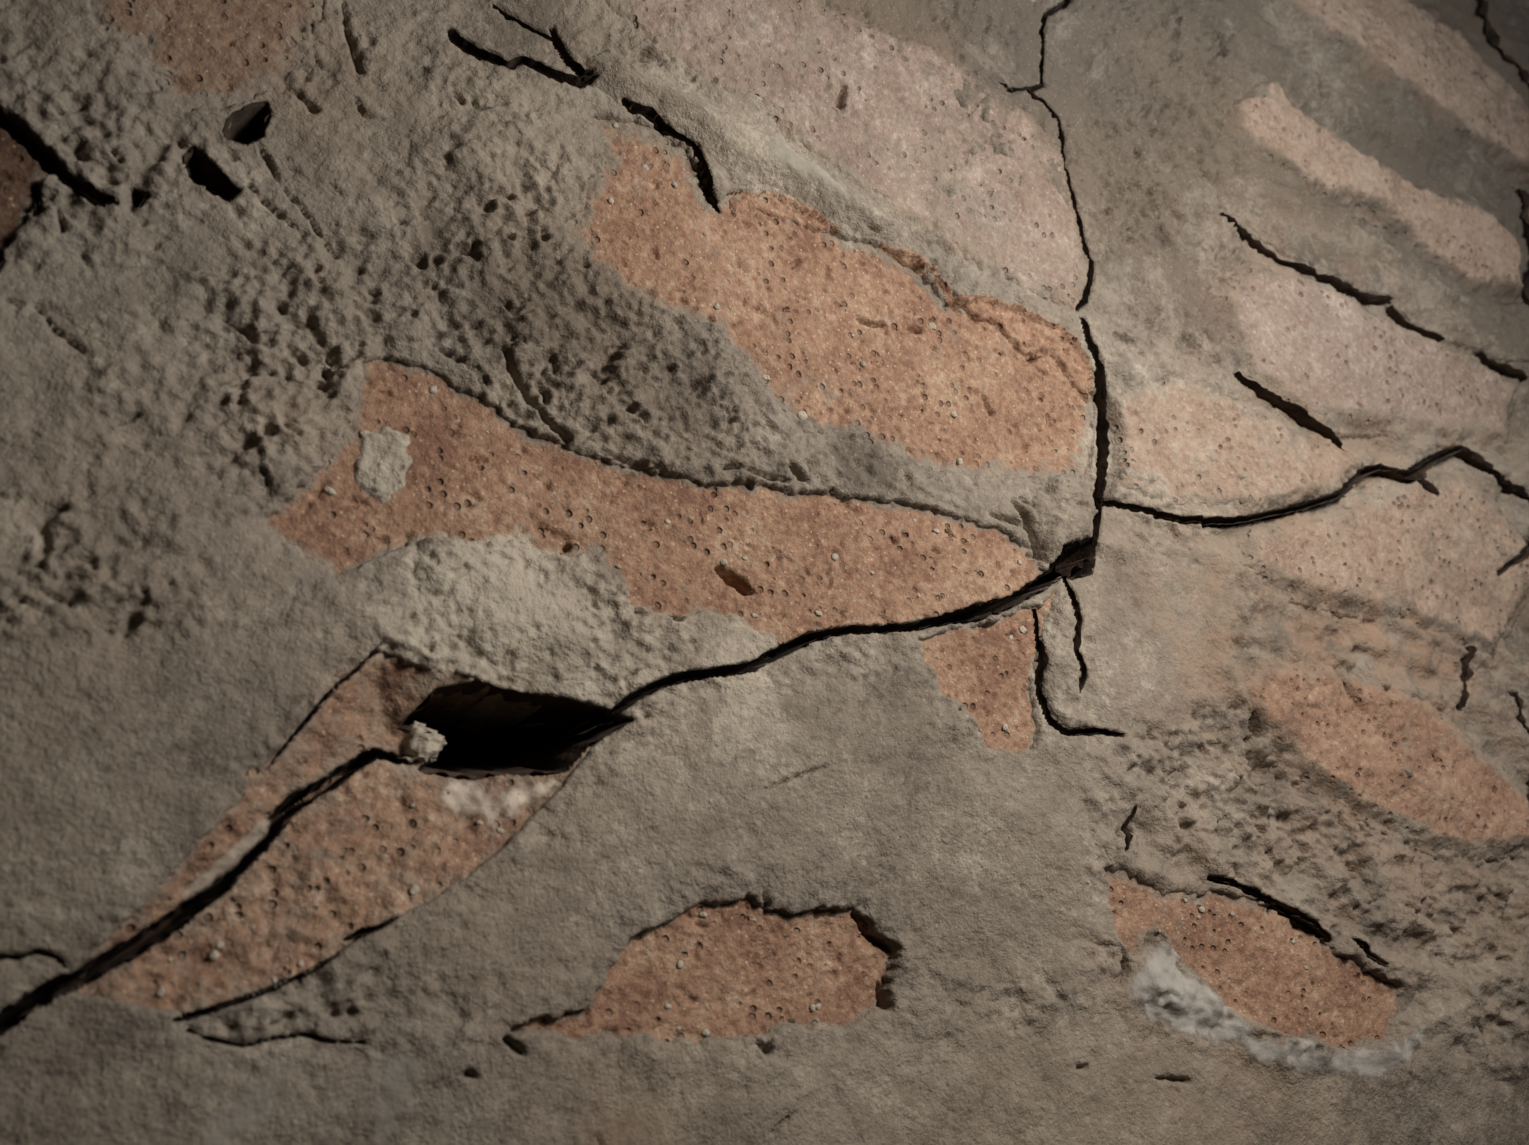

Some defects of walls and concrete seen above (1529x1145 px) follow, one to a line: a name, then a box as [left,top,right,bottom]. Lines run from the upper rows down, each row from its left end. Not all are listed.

crack [0,105,146,217]
crack [448,4,720,213]
crack [563,0,1529,739]
spalling [564,0,1529,659]
spalling [265,359,1055,754]
crack [0,749,439,1045]
spalling [74,652,592,1015]
spalling [510,898,891,1043]
crack [1120,806,1137,850]
spalling [1105,870,1406,1050]
crack [1207,876,1389,967]
flaking render [1245,657,1529,862]